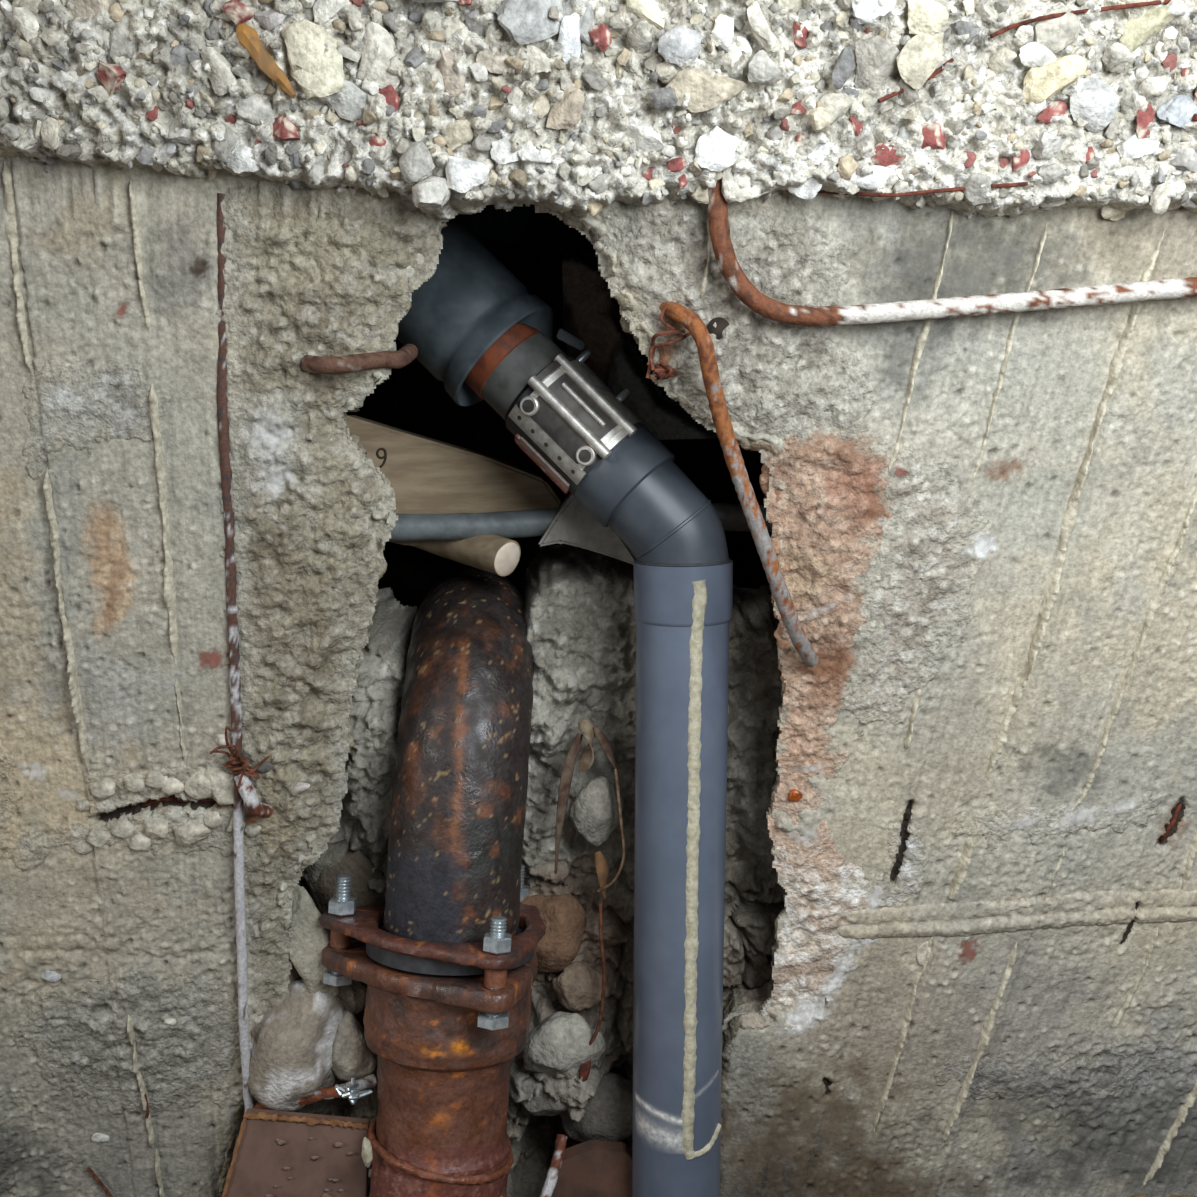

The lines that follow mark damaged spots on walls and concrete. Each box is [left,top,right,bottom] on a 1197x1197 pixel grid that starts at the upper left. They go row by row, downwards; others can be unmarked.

spalling [0,0,1197,441]
spalling [22,356,172,480]
spalling [215,177,443,1016]
spalling [756,426,994,1018]
crack [74,767,262,855]
crack [890,801,912,882]
spalling [951,791,1166,851]
crack [1120,902,1139,944]
spalling [10,967,240,1117]